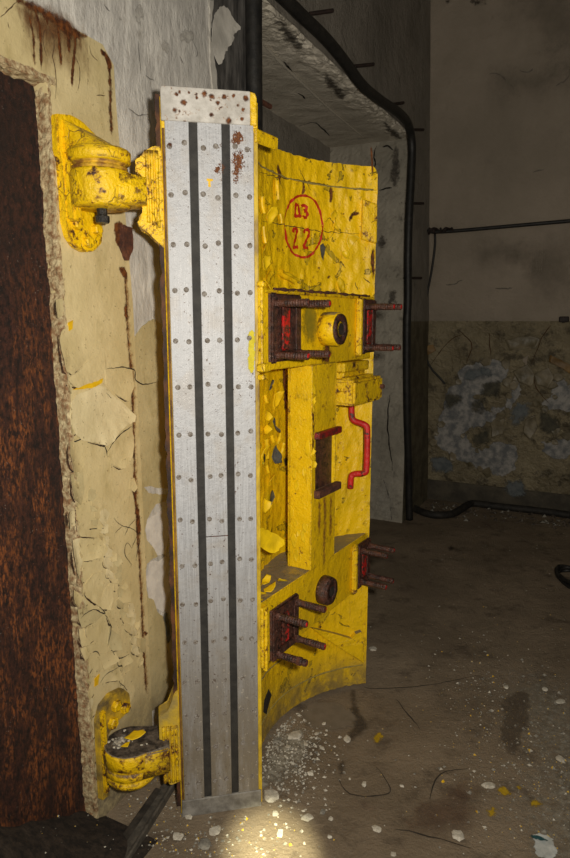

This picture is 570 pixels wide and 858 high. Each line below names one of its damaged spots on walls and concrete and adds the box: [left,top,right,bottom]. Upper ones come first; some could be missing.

rust [17,0,87,85]
peeling [208,0,241,89]
rust [101,49,113,132]
rust [114,221,133,368]
crack [108,366,157,385]
peeling [428,355,570,478]
crack [77,521,140,565]
peeling [54,298,174,792]
rust [133,491,148,637]